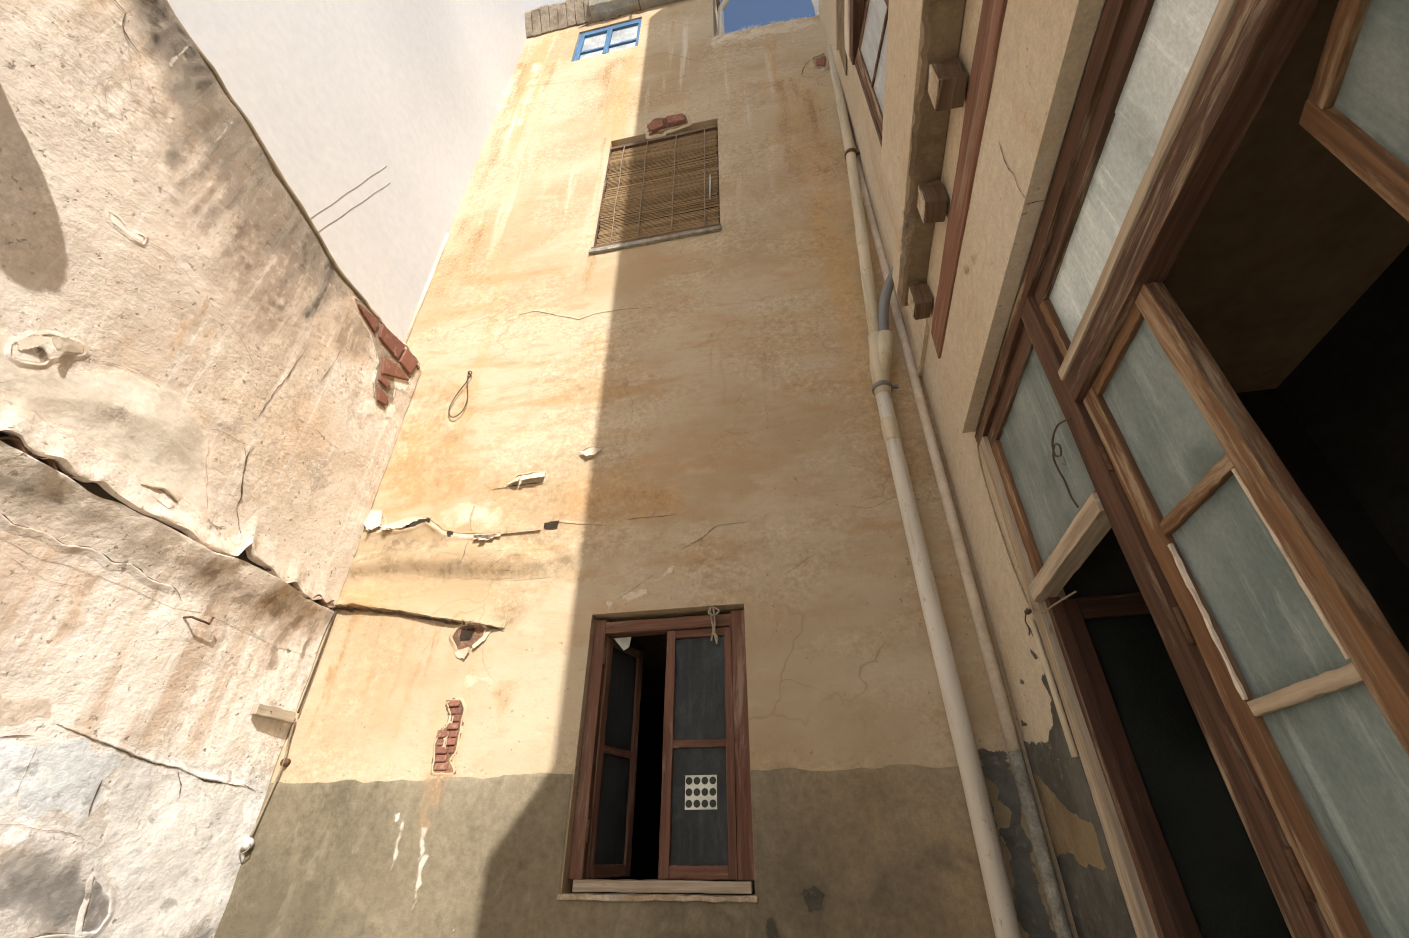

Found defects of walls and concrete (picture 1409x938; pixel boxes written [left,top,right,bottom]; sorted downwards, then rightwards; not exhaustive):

crack [104,0,189,136]
flaking render [644,113,692,139]
flaking render [351,296,420,409]
crack [0,513,258,636]
peeling [356,508,559,559]
flaking render [448,619,491,659]
crack [0,718,258,840]
flaking render [430,697,467,776]
peeling [1021,625,1137,938]
peeling [978,748,1056,938]
spalling [75,872,116,938]